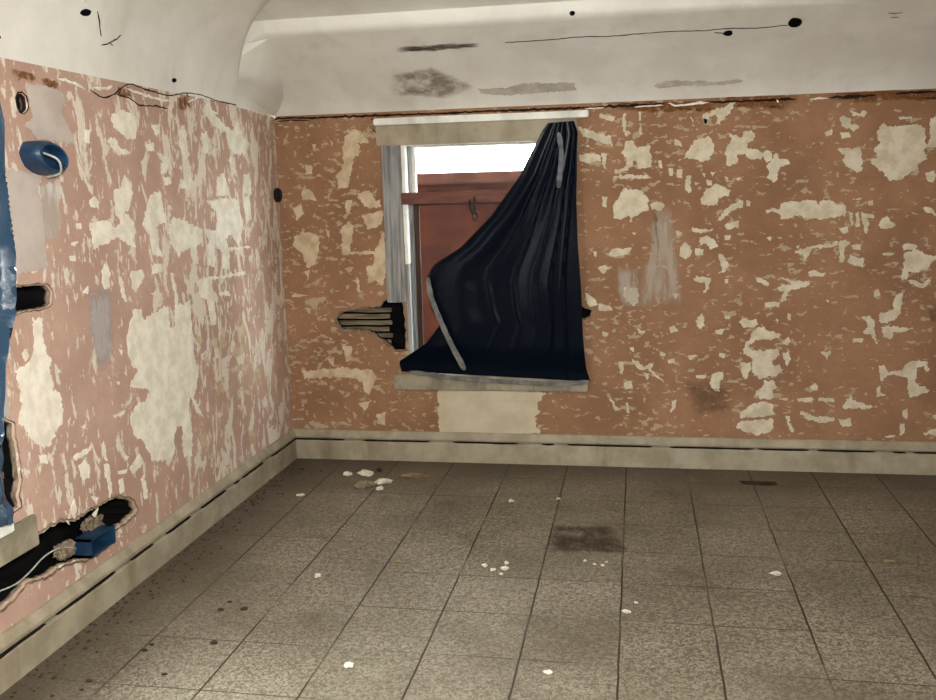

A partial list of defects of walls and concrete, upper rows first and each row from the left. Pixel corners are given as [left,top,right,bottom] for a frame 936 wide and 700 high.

flaking render [15,78,112,145]
water stain [404,73,465,96]
peeling [825,110,936,182]
peeling [292,189,386,292]
peeling [578,101,790,293]
peeling [766,197,896,268]
peeling [882,243,936,288]
flaking render [334,299,407,352]
peeling [853,293,913,344]
peeling [0,124,252,613]
peeling [715,313,930,438]
water stain [554,527,622,552]